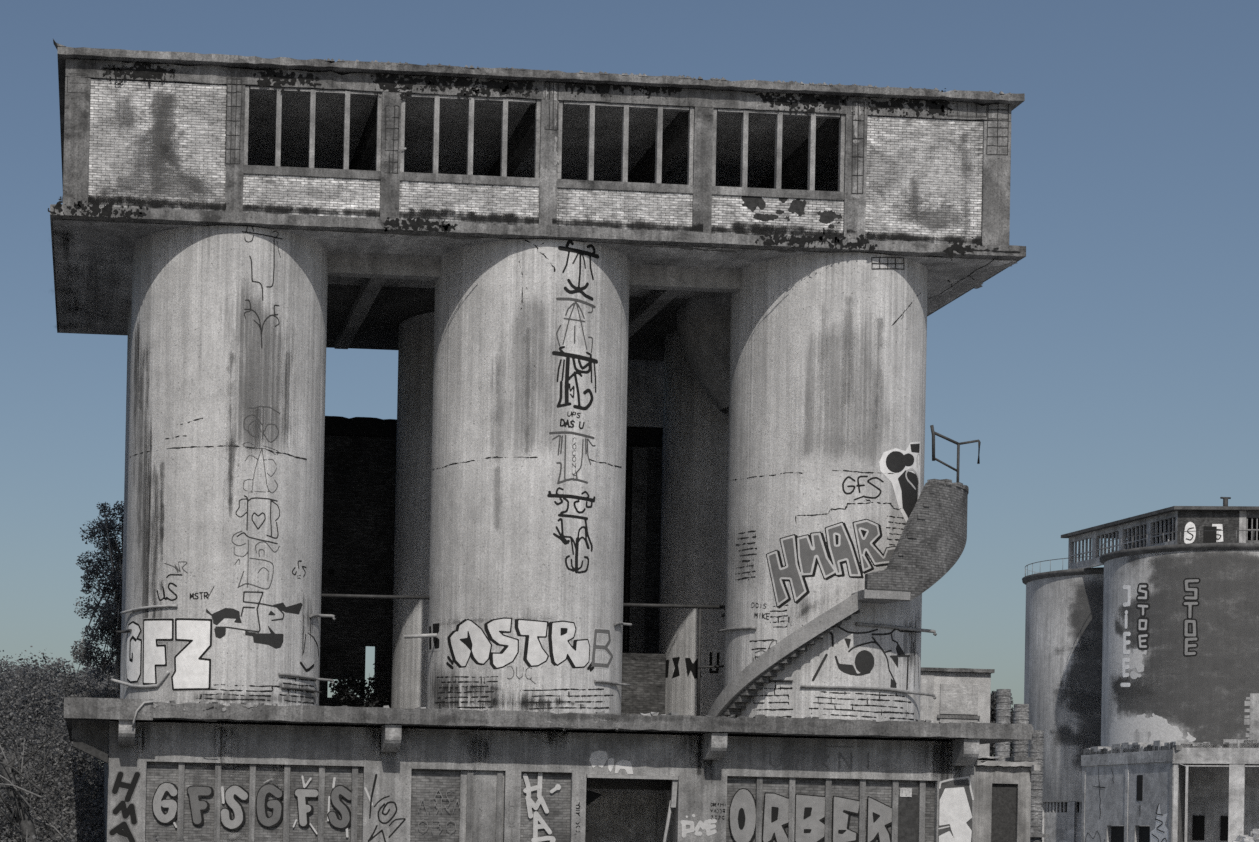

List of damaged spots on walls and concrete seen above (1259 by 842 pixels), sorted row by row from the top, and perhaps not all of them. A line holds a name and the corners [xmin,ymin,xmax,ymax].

leakage [88,94,226,210]
leakage [243,204,380,216]
leakage [399,188,982,244]
leakage [139,449,163,618]
leakage [1057,550,1259,767]